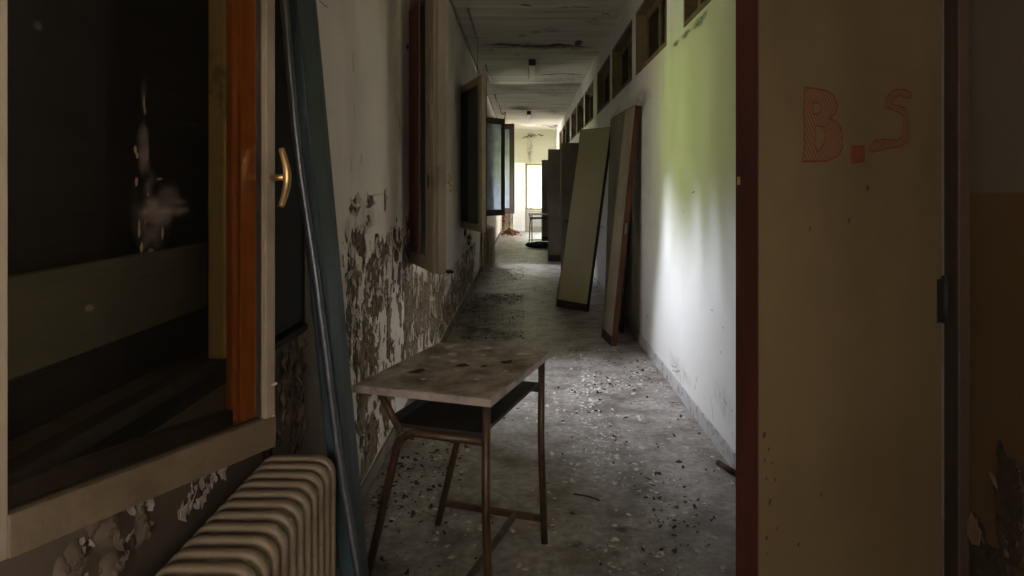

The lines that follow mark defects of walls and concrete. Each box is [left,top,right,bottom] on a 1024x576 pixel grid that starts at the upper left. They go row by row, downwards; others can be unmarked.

peeling [342,188,476,483]
peeling [124,498,155,516]
peeling [178,467,227,522]